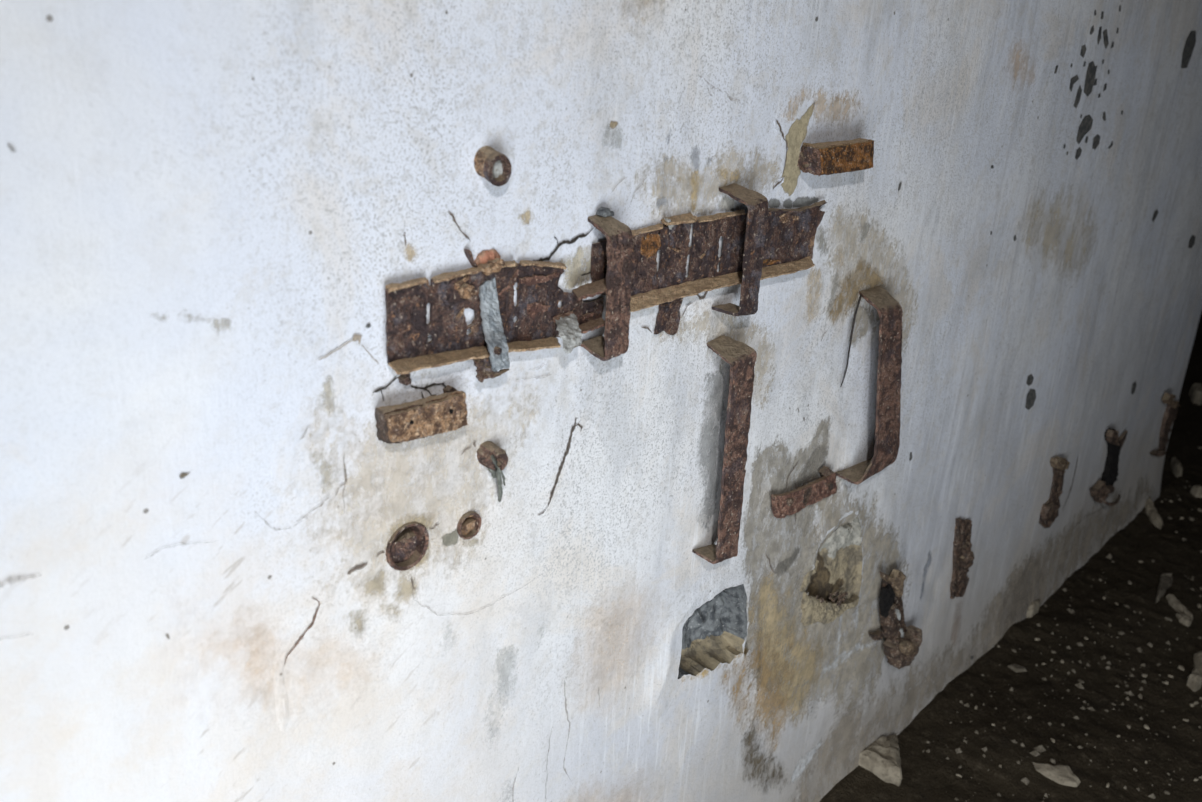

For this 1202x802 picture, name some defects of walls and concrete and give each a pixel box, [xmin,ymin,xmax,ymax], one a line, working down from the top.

crack [298,454,347,521]
crack [539,418,583,515]
flaking render [678,418,863,691]
leakage [724,549,872,746]
corrosion [961,542,975,569]
leakage [792,484,1148,802]